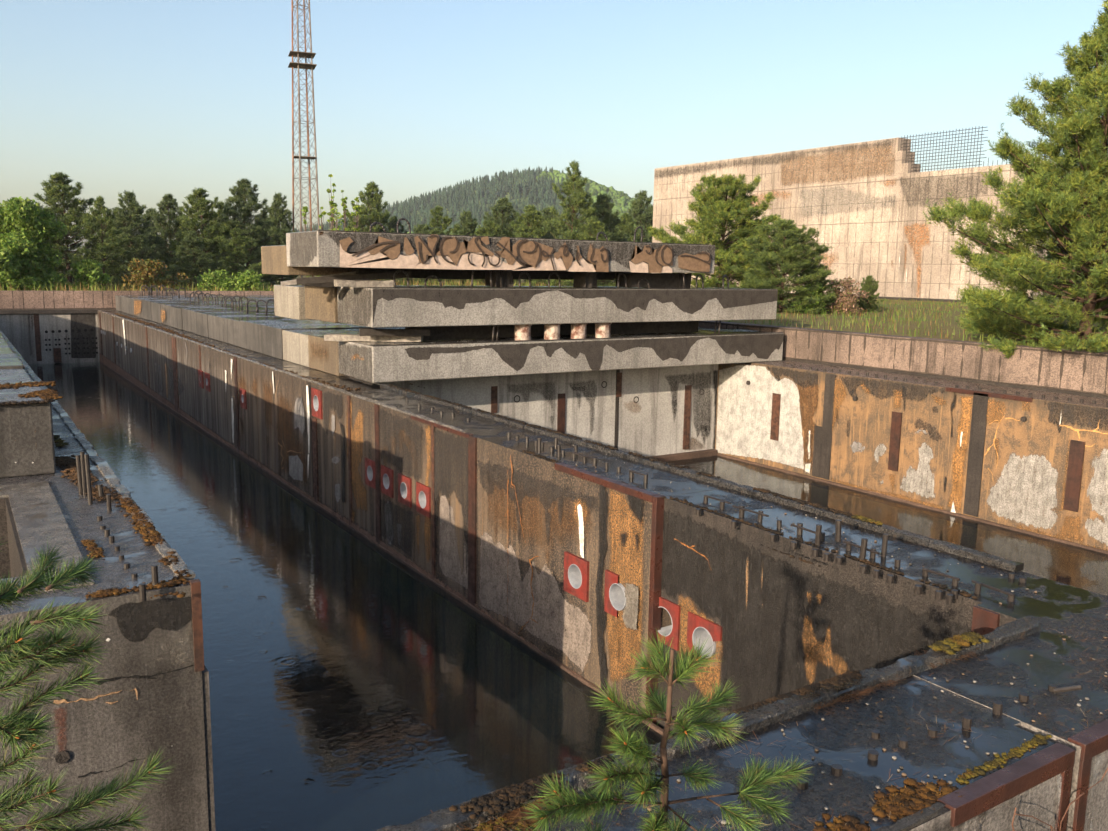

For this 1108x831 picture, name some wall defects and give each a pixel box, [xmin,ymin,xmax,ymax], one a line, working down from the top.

corrosion [346,402,367,523]
corrosion [798,380,818,473]
corrosion [832,379,846,427]
peeling [850,441,886,463]
corrosion [831,396,972,510]
peeling [900,430,935,498]
peeling [986,453,1058,530]
crack [1060,420,1108,447]
peeling [1085,449,1108,546]
peeling [439,495,591,672]
corrosion [607,490,643,679]
corrosion [803,616,847,683]